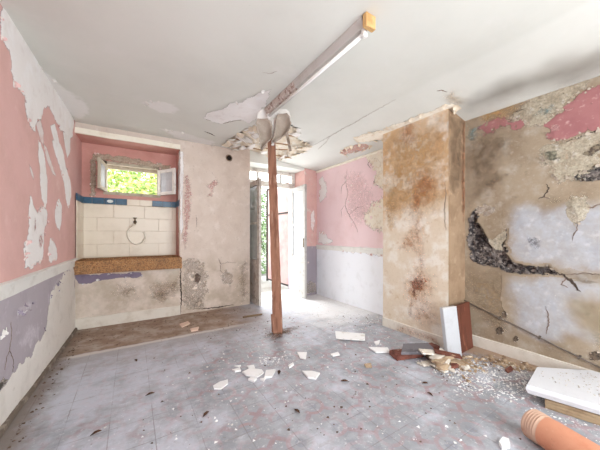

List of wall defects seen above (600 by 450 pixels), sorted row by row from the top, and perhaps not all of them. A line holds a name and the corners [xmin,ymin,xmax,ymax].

peeling [0,8,91,269]
peeling [90,153,171,197]
peeling [203,90,271,157]
spalling [276,125,312,161]
peeling [339,104,462,233]
leakage [388,133,439,209]
spalling [470,80,600,184]
spalling [466,205,559,276]
crack [557,272,599,292]
peeling [0,268,142,426]